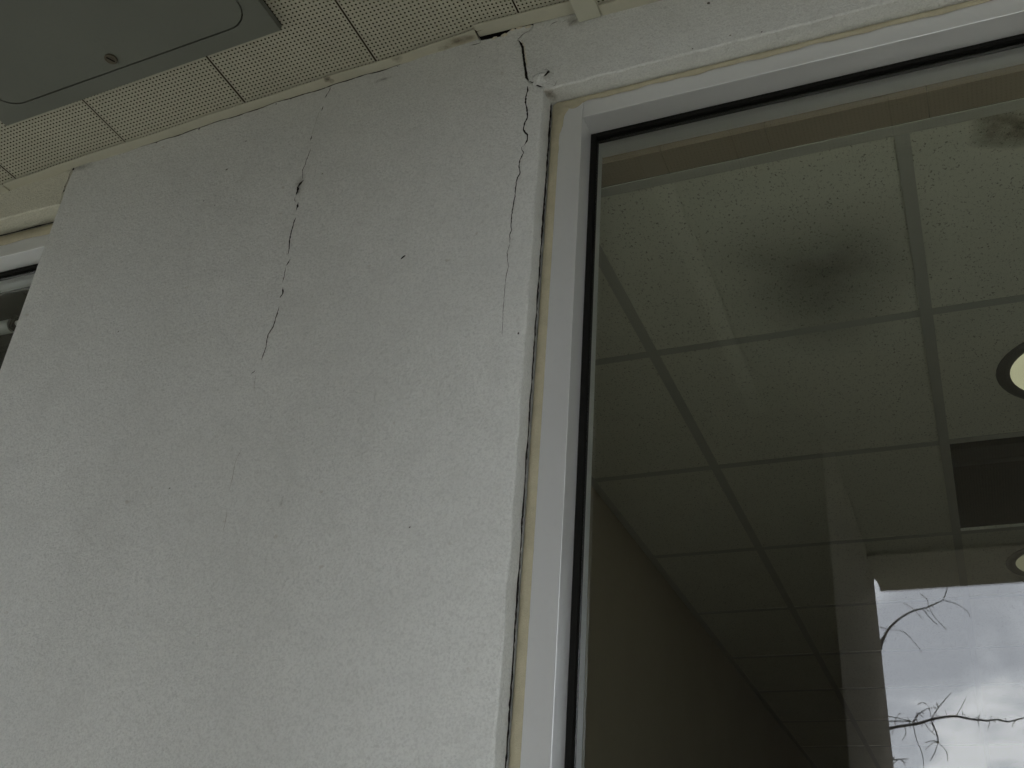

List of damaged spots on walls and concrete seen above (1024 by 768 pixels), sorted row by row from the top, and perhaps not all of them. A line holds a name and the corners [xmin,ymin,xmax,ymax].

crack [144,65,398,384]
crack [502,19,567,768]